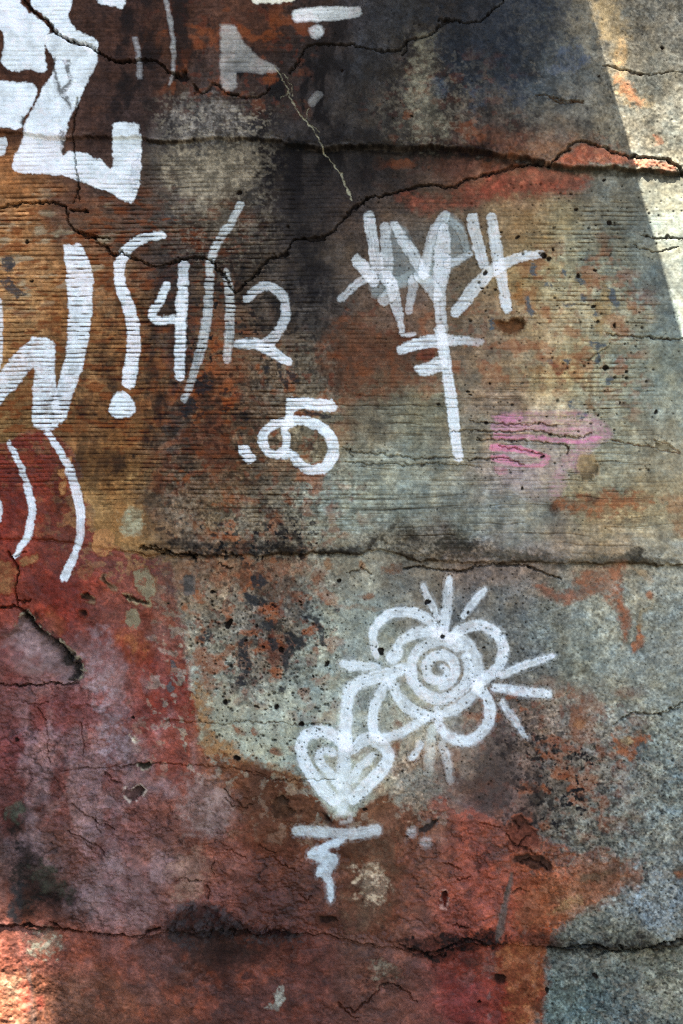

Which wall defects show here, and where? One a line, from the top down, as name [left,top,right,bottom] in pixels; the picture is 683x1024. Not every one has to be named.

leakage [393,0,594,156]
rust [584,0,662,114]
leakage [148,86,395,324]
crack [0,0,683,294]
rust [392,128,678,249]
leakage [543,161,672,181]
rust [197,554,335,621]
crack [402,562,562,580]
rust [183,649,300,774]
peeling [0,430,619,1024]
crack [0,921,161,938]
crack [547,938,683,958]